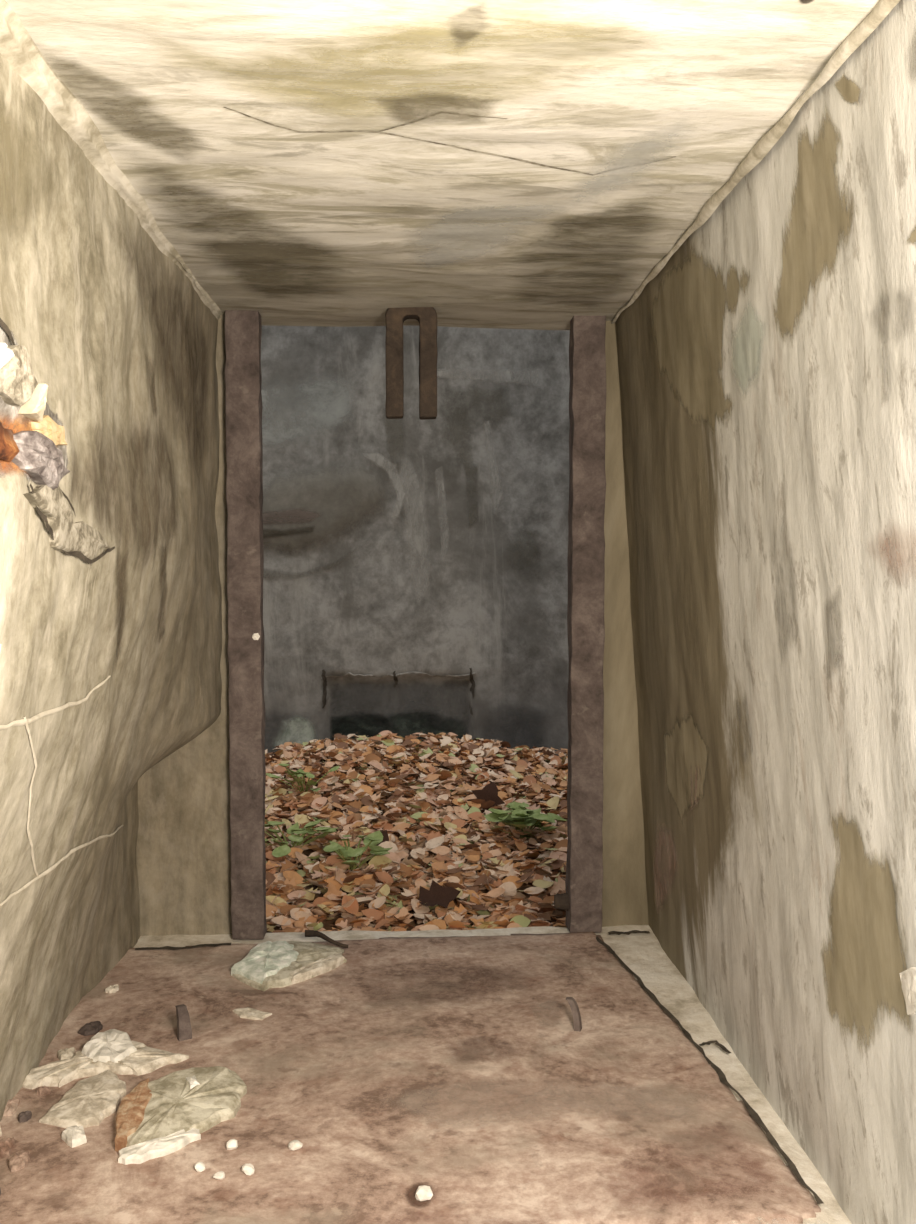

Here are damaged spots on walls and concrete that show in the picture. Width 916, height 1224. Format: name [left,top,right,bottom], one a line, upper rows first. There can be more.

damp [54,60,195,149]
damp [221,21,601,122]
peeling [835,75,860,104]
damp [160,174,327,294]
damp [524,206,650,303]
peeling [774,113,853,338]
damp [142,277,207,454]
rust [0,422,19,462]
spalling [0,318,115,566]
peeling [822,814,916,1046]